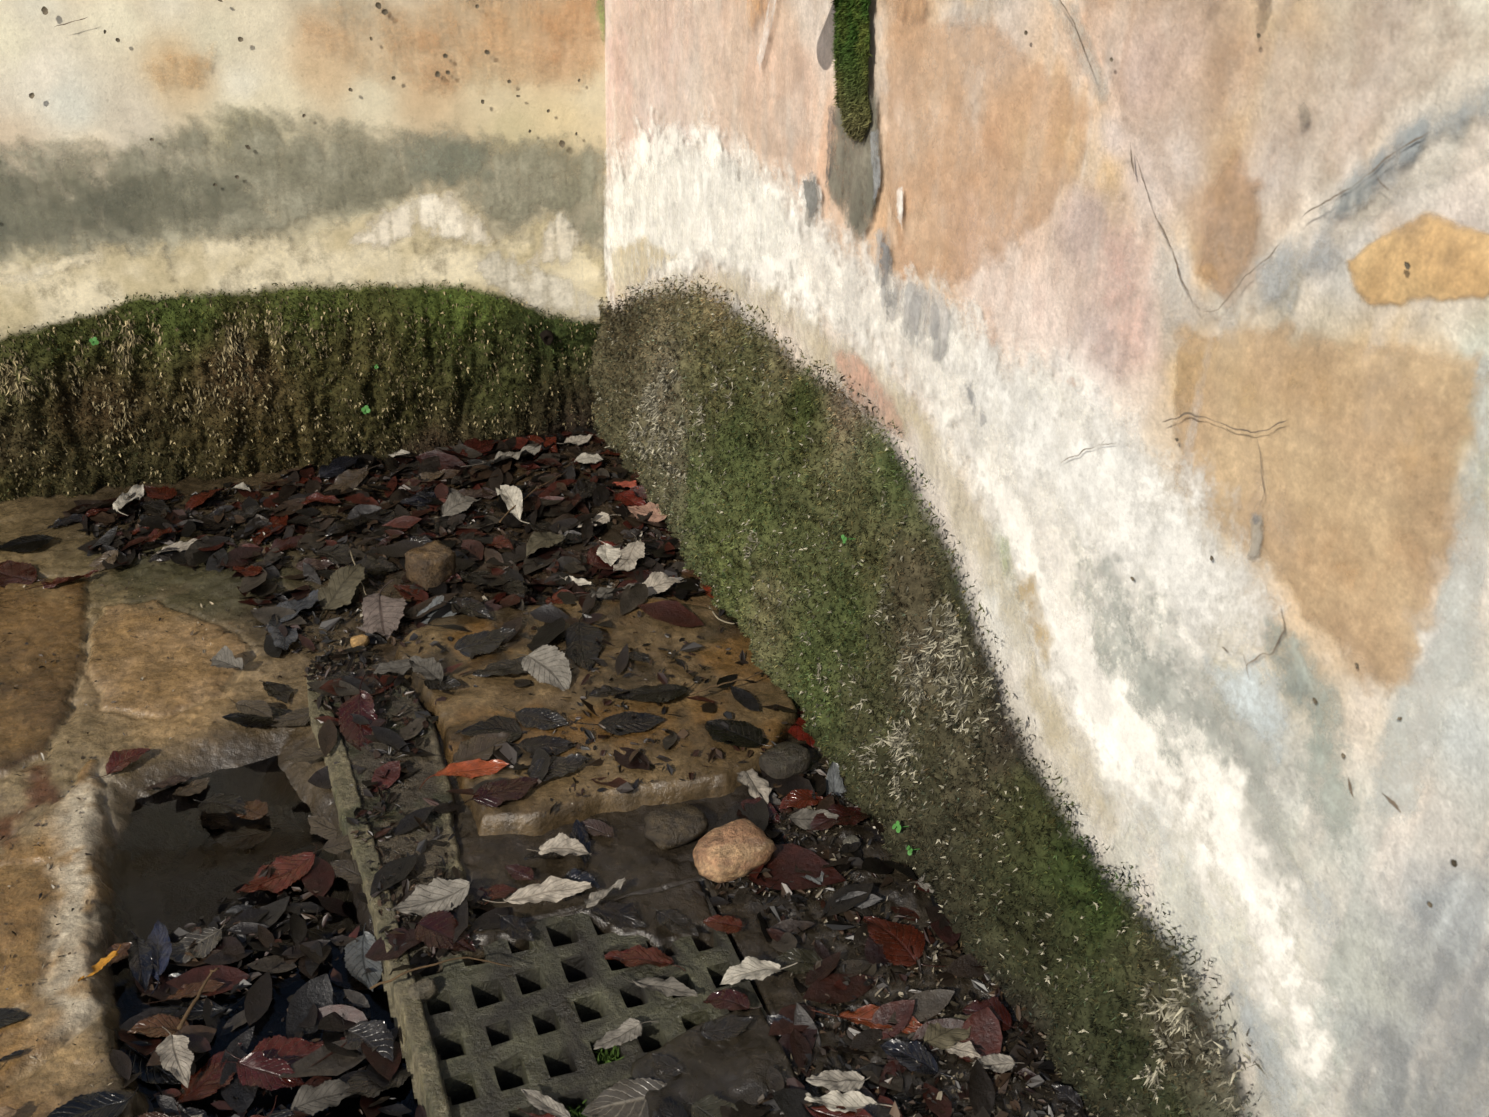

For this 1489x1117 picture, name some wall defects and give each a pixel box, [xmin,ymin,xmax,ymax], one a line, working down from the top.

crack [1060,0,1096,80]
leakage [1321,79,1489,215]
leakage [0,192,616,339]
crack [1130,131,1431,312]
leakage [603,88,1335,1116]